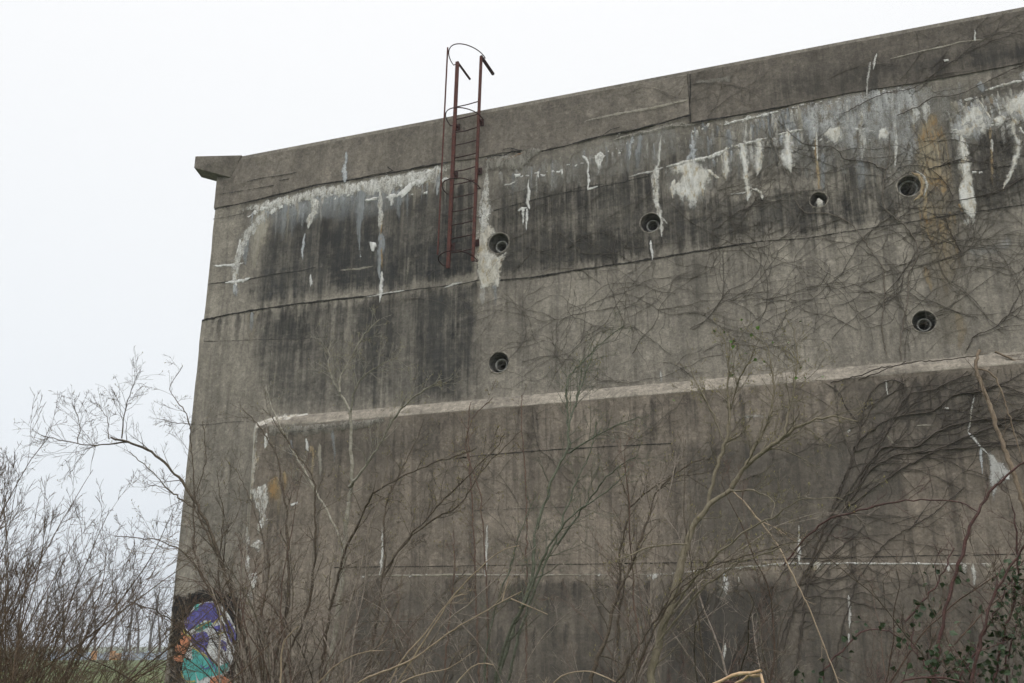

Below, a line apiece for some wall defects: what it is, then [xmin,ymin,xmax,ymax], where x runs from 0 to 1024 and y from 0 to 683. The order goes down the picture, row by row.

water stain [213,53,1024,388]